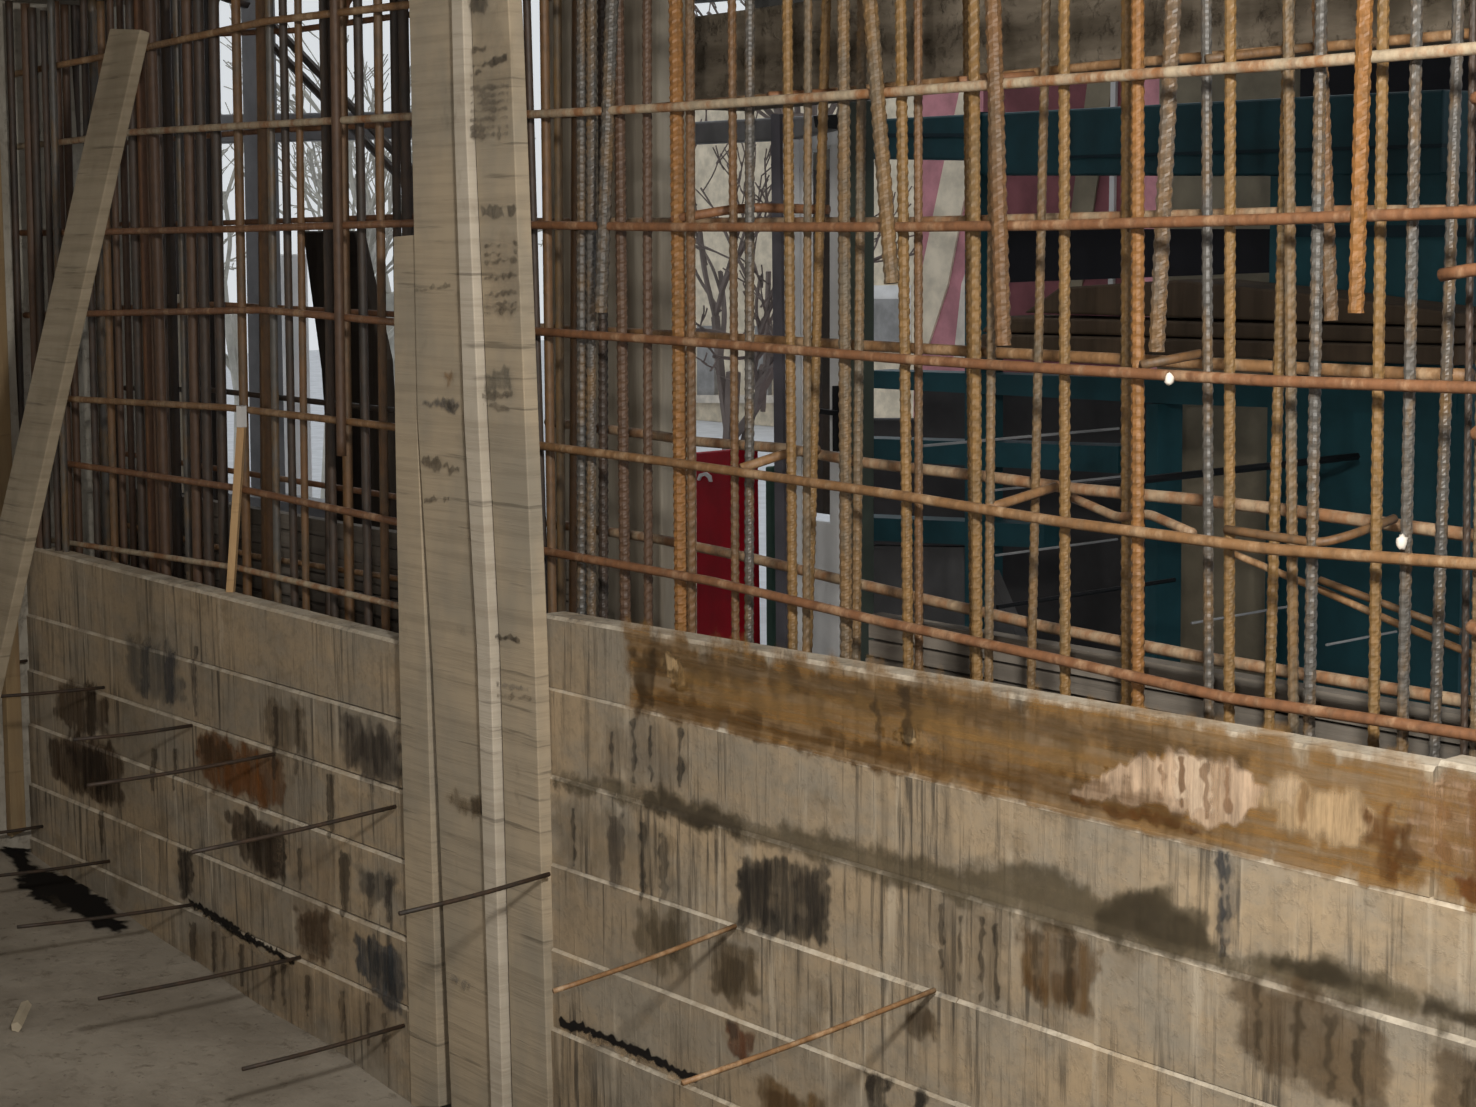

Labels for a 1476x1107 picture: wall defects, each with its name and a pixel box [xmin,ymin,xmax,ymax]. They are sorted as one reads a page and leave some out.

damp [49,679,125,852]
corrosion [196,731,285,808]
damp [226,806,302,886]
damp [327,774,393,922]
damp [345,713,402,781]
damp [554,620,1476,1107]
peeling [1072,748,1374,850]
damp [189,924,244,986]
damp [355,934,404,1047]